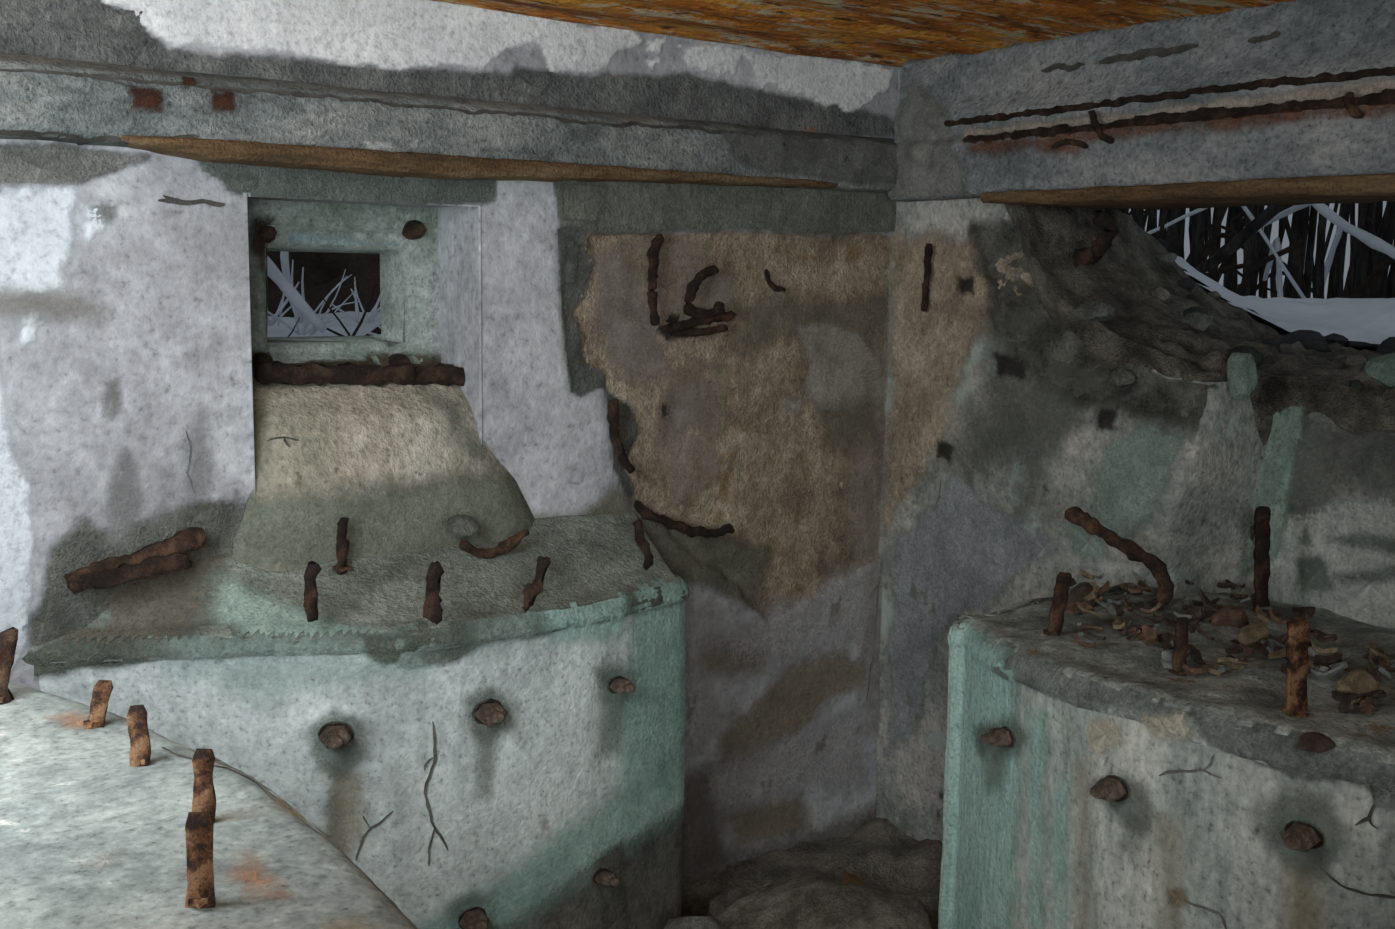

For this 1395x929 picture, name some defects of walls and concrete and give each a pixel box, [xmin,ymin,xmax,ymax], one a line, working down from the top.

rust [1197,105,1393,129]
rust [252,353,466,387]
spalling [557,211,1216,617]
peeling [1239,406,1395,628]
rust [63,527,207,594]
spalling [963,626,1395,808]
crack [424,721,449,866]
crack [356,811,393,860]
crack [1317,865,1395,899]